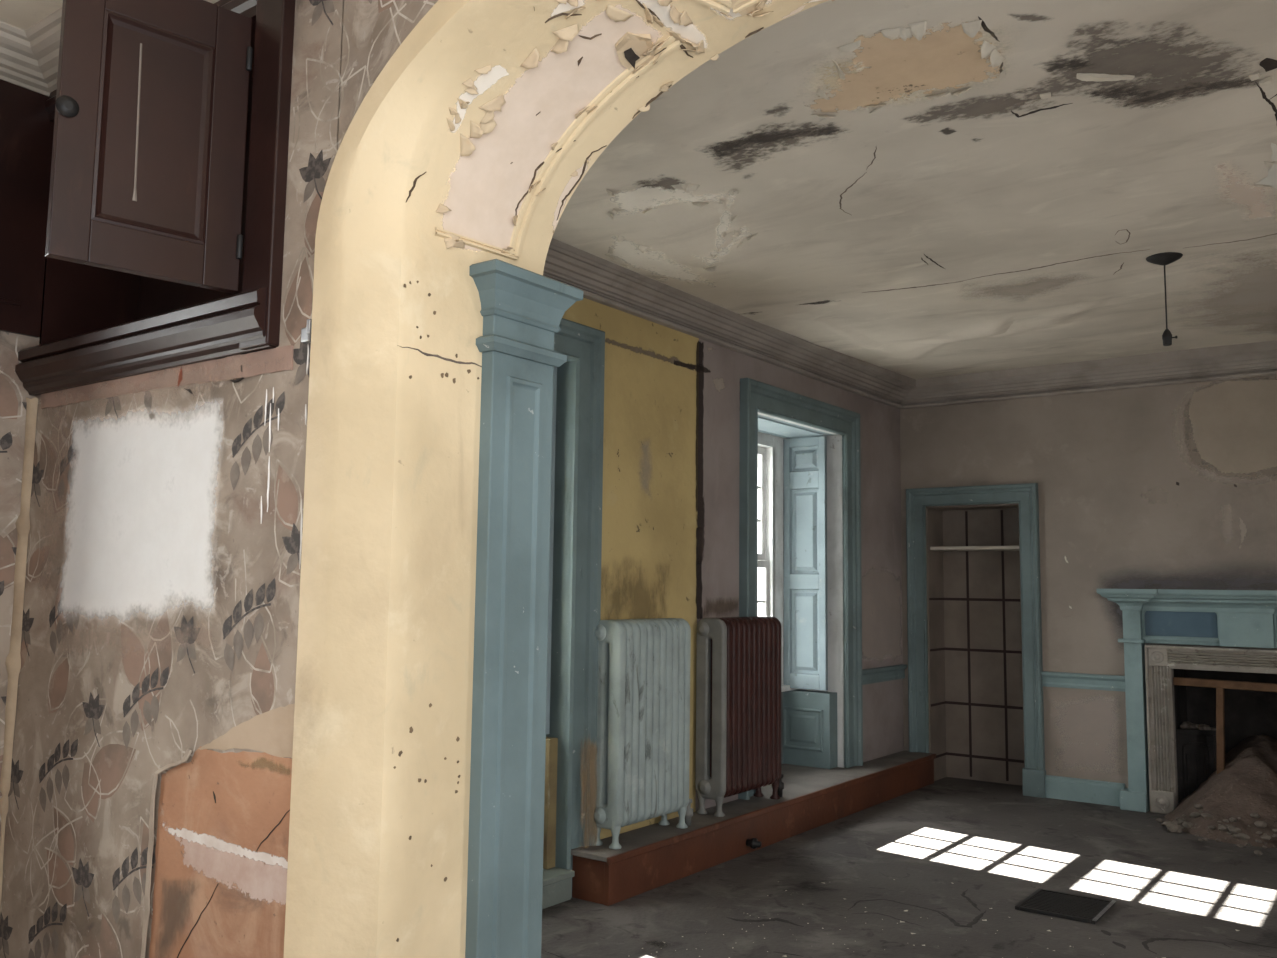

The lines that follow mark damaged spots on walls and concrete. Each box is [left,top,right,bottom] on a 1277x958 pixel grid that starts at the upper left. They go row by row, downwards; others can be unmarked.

peeling [710,0,835,19]
peeling [436,0,719,253]
spalling [810,20,1006,118]
leakage [905,23,1254,135]
crack [1255,81,1277,121]
peeling [605,183,758,285]
crack [397,345,482,367]
flaking render [149,703,295,958]
crack [255,810,290,853]
crack [177,883,219,958]